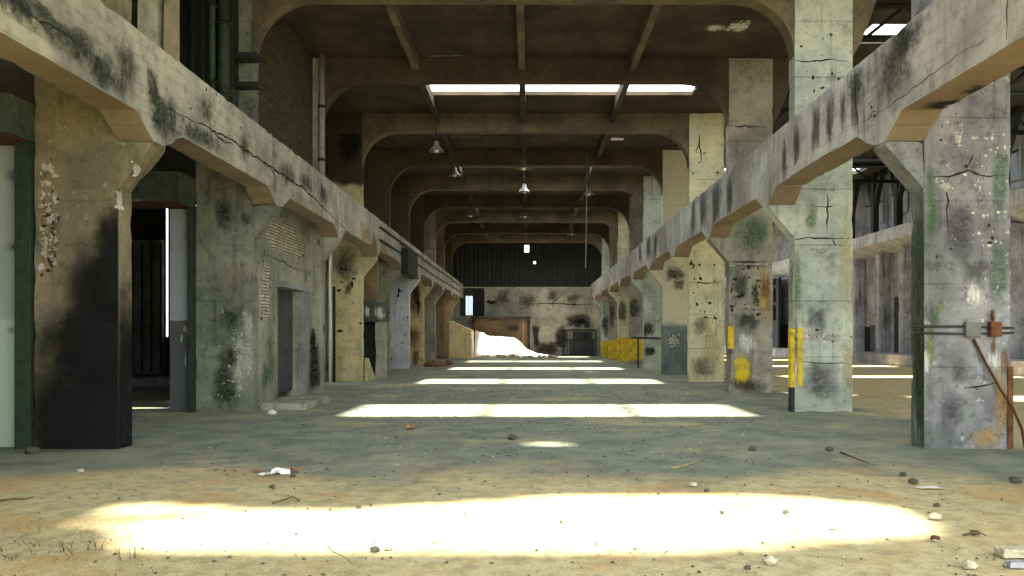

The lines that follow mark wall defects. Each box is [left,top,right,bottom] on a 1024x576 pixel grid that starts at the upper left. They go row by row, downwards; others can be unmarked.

crack [795,0,1008,129]
water stain [148,70,219,150]
flaking render [38,163,61,277]
crack [173,110,343,227]
crack [796,193,853,246]
crack [934,153,1002,228]
mould [215,346,249,402]
rust [991,341,1008,420]